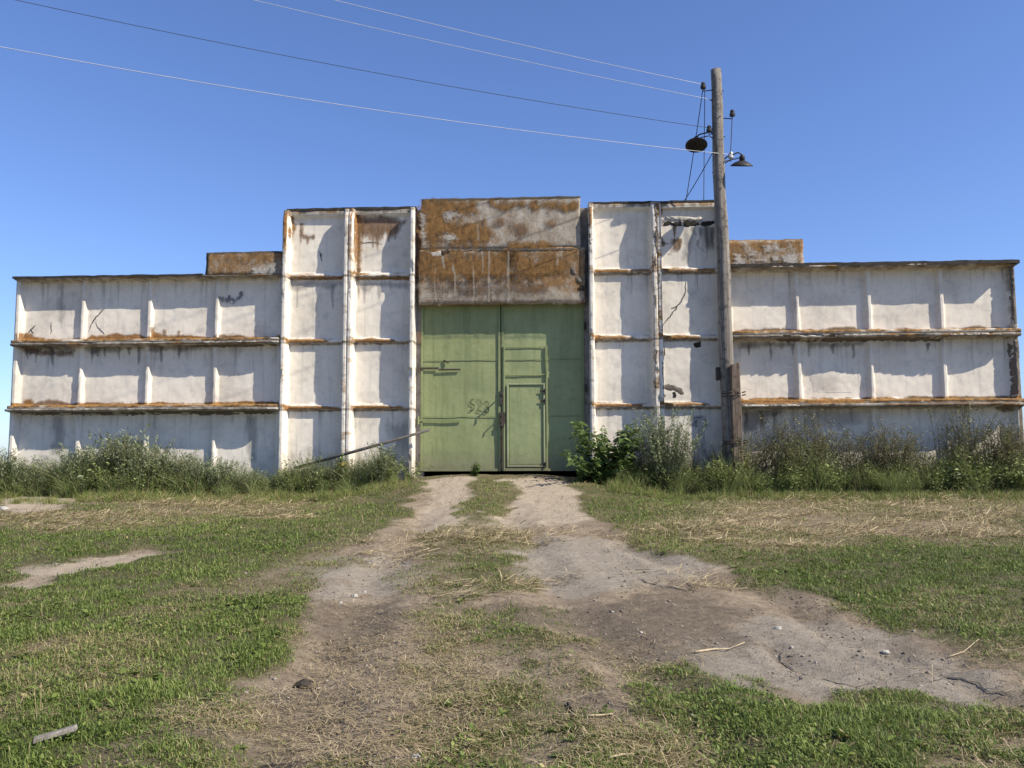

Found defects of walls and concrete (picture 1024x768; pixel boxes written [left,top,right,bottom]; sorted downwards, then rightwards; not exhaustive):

corrosion [348,198,592,305]
spalling [653,205,715,307]
corrosion [88,328,200,339]
crack [661,282,686,383]
spalling [655,349,684,398]
corrosion [14,399,68,408]
corrosion [878,396,1021,412]